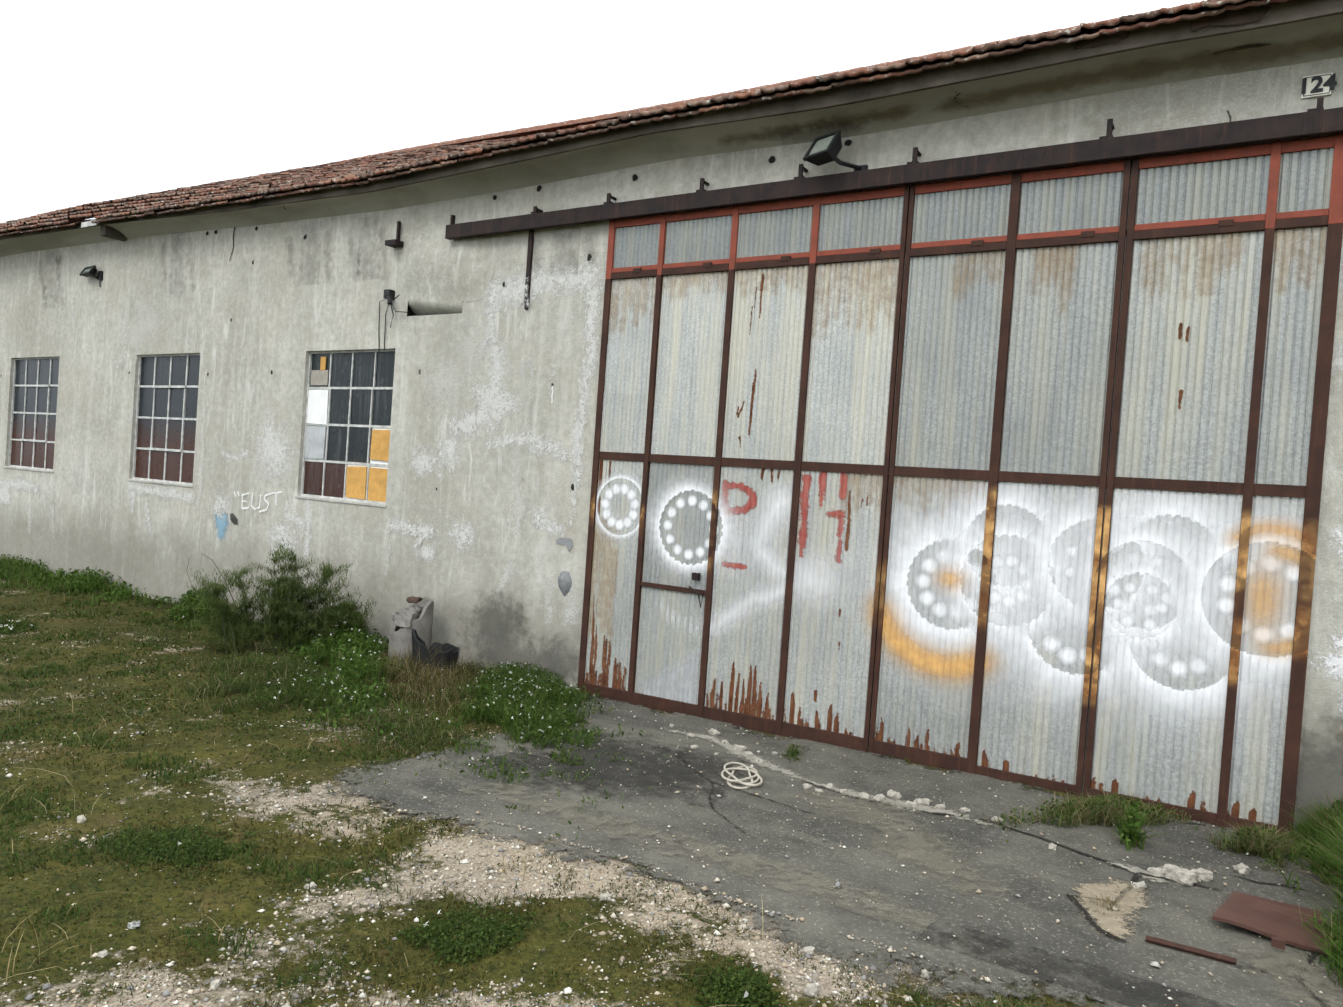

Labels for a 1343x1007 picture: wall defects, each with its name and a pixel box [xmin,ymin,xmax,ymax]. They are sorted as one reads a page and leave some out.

corrosion [584,595,626,690]
corrosion [706,662,852,735]
peeling [1309,649,1343,713]
corrosion [874,718,960,757]
corrosion [981,750,1009,772]
corrosion [1090,777,1119,793]
corrosion [1187,790,1206,811]
corrosion [1227,801,1257,821]